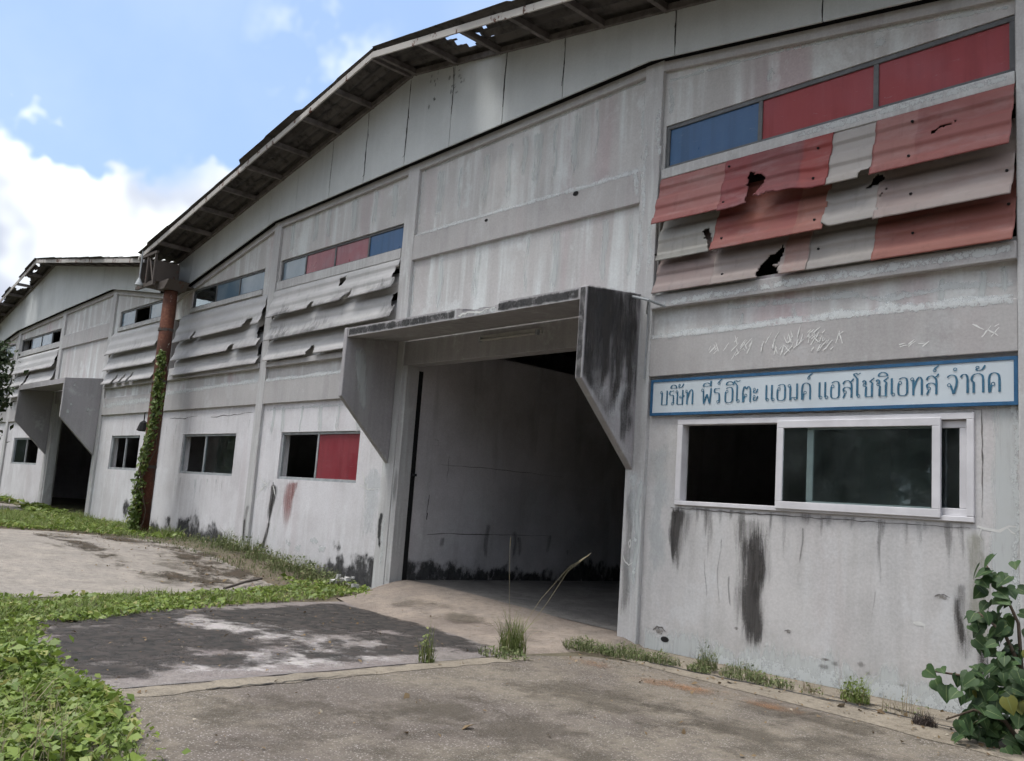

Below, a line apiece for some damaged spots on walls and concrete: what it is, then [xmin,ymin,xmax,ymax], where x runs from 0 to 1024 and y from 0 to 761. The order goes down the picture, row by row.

damp [349,266,455,335]
peeling [653,245,1013,339]
damp [498,234,640,438]
damp [150,515,223,542]
damp [669,509,684,562]
damp [318,546,374,587]
damp [406,560,620,581]
damp [742,531,764,643]
damp [956,600,964,641]